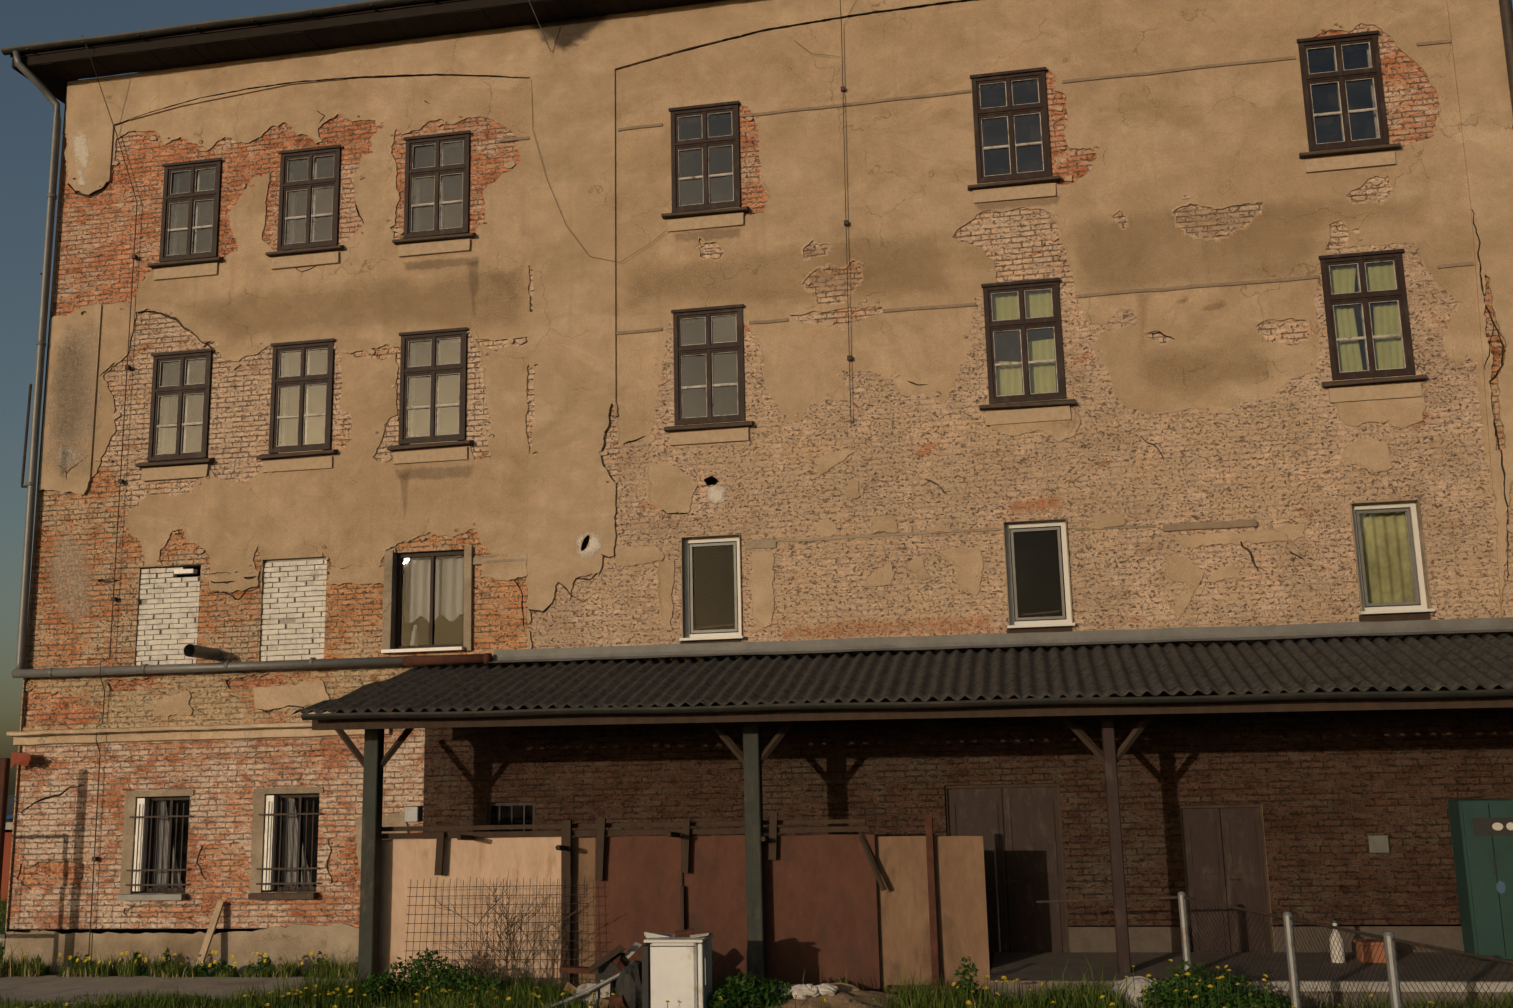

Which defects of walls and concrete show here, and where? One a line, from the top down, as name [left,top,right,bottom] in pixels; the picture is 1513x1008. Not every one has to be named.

spalling [739,104,772,216]
spalling [1045,67,1100,185]
spalling [1171,195,1264,240]
spalling [1347,174,1396,204]
spalling [1311,23,1448,148]
spalling [24,112,521,727]
spalling [317,206,1513,672]
crack [1471,209,1509,581]